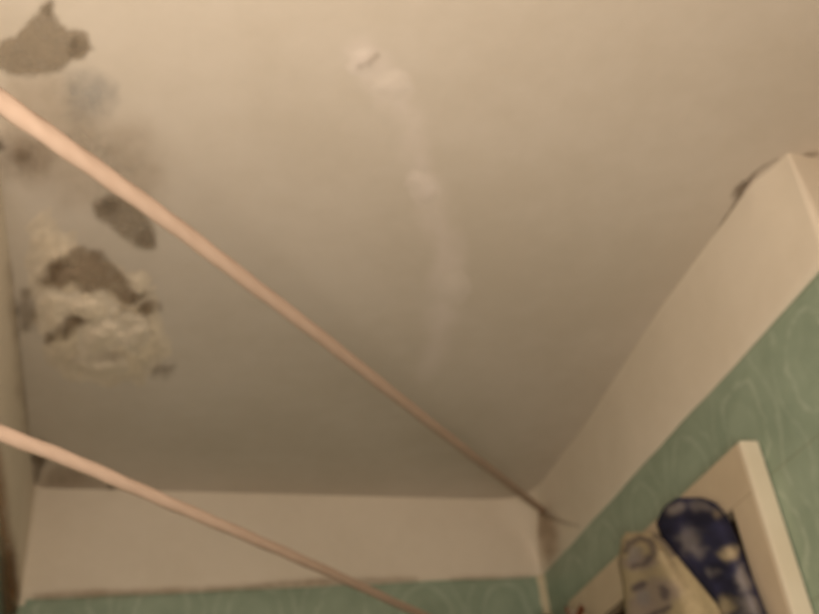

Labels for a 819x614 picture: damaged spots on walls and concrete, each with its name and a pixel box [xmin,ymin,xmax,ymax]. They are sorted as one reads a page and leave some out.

peeling [0,4,89,74]
flaking render [96,197,154,247]